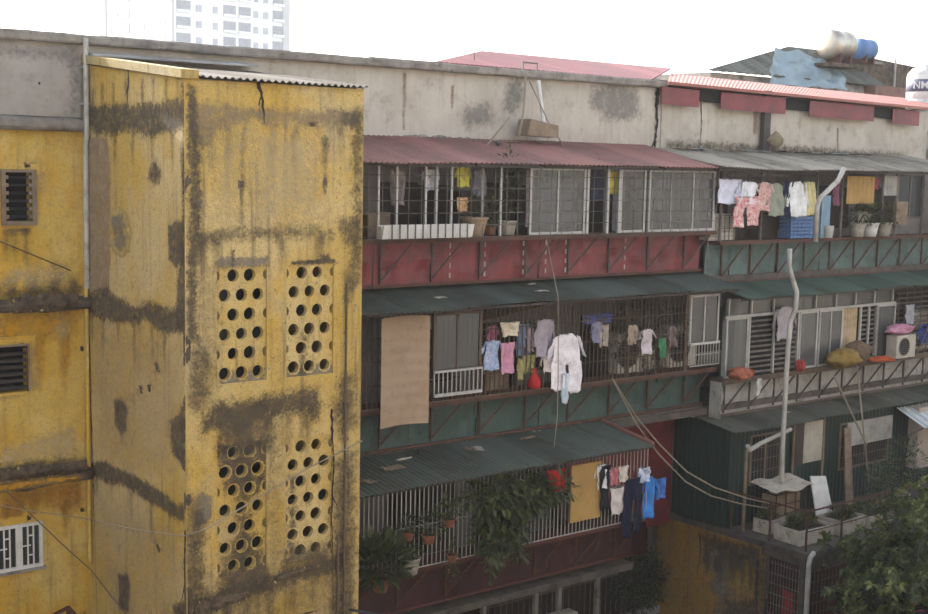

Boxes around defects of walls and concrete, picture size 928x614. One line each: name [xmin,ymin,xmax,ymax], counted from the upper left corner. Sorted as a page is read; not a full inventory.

crack [256,82,265,124]
water stain [592,84,638,119]
water stain [0,81,363,614]